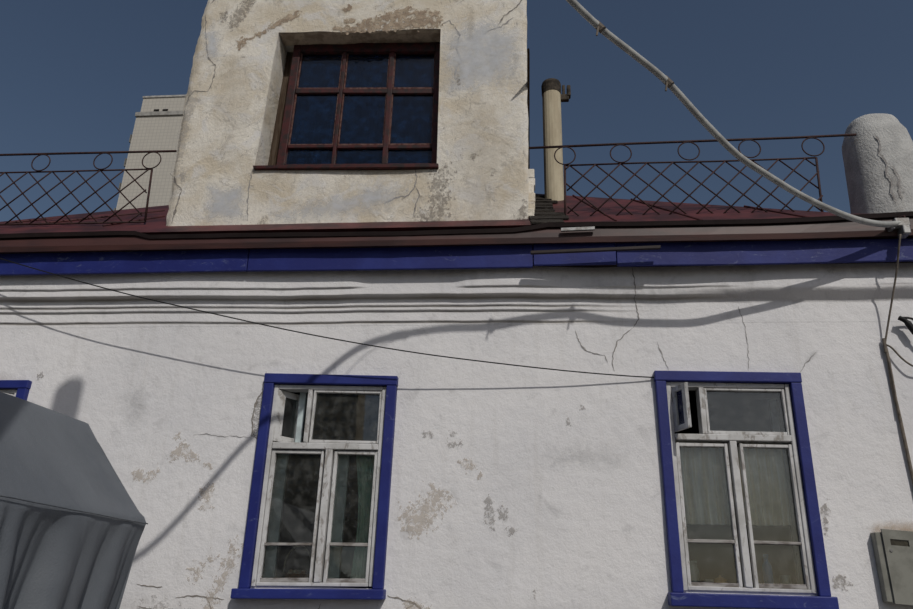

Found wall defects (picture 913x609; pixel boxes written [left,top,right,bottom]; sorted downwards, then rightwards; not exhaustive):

flaking render [236,10,300,50]
flaking render [332,4,443,35]
crack [874,133,903,201]
crack [171,175,182,222]
crack [575,268,639,369]
peeling [484,494,515,537]
crack [138,584,224,609]